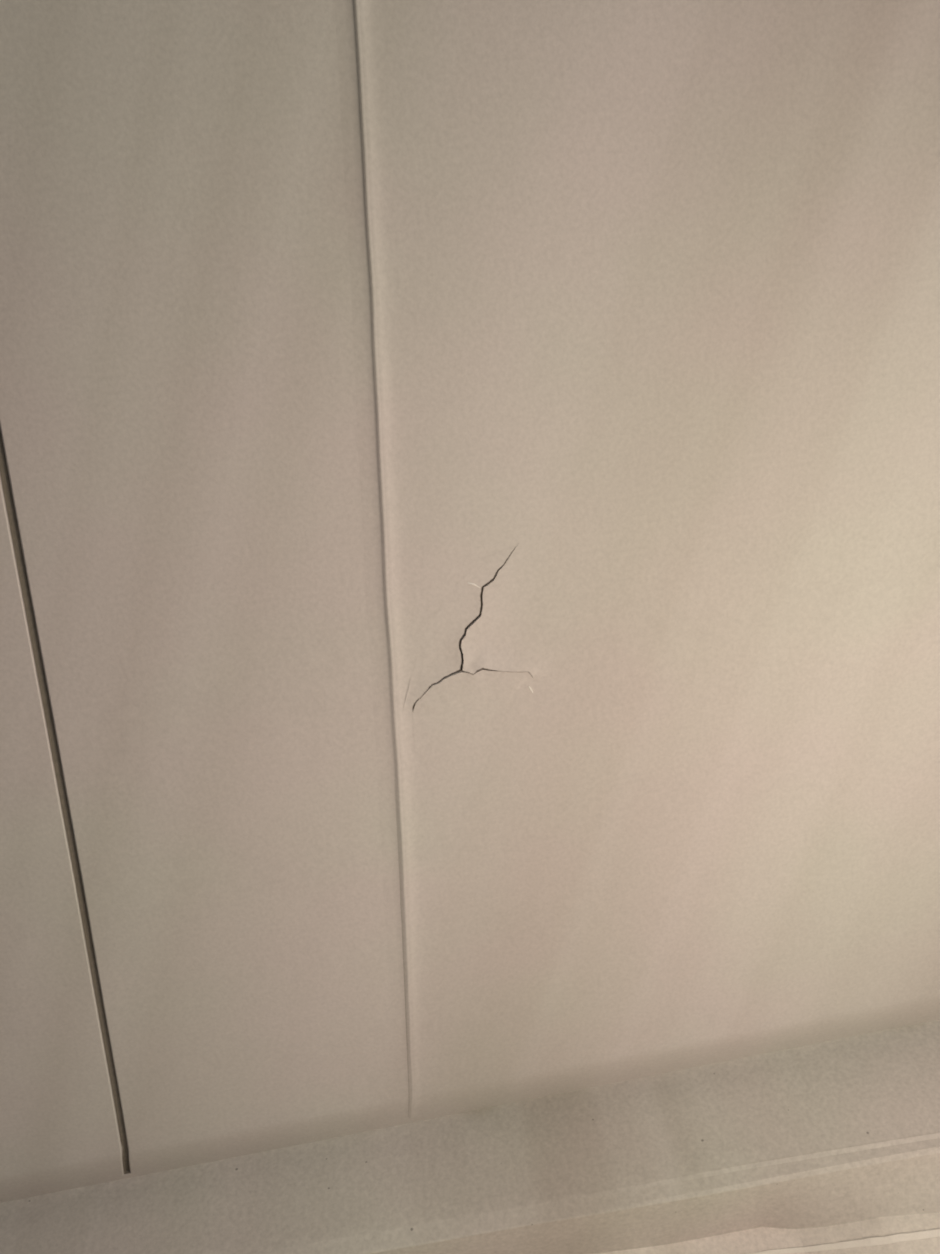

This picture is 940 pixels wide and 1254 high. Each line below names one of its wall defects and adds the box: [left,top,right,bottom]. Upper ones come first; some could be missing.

crack [403,543,558,763]
crack [395,792,409,1117]